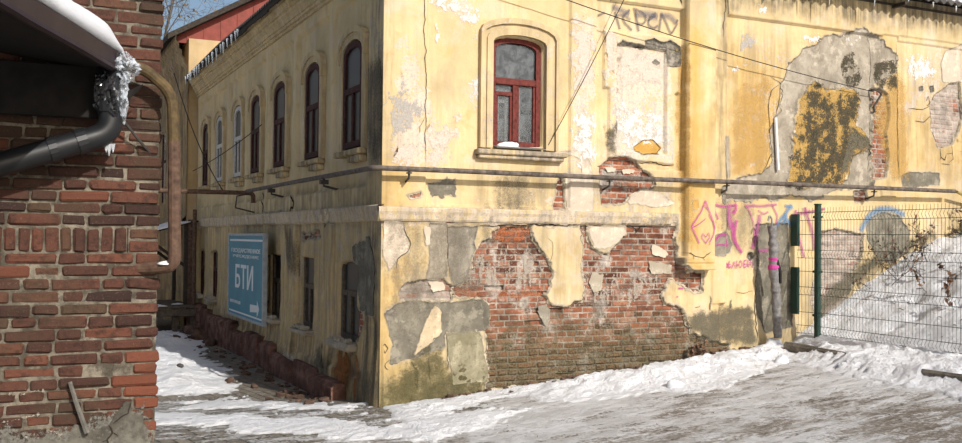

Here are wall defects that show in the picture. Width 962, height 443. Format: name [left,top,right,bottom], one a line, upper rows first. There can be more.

crack [419,0,427,159]
peeling [384,73,465,200]
peeling [428,0,483,42]
spalling [552,16,681,211]
flaking render [721,27,962,204]
leakage [786,52,907,191]
spalling [352,221,733,390]
crack [103,403,131,443]